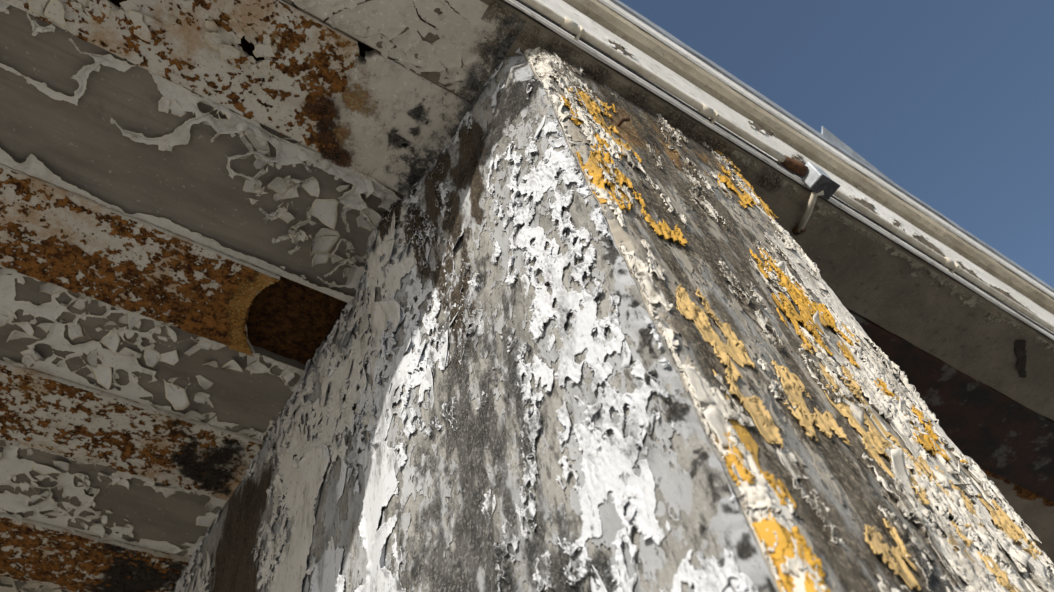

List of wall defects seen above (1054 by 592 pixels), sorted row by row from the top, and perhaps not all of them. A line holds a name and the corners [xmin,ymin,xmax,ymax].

corrosion [64,0,385,168]
corrosion [0,168,347,365]
peeling [0,0,521,592]
leakage [377,0,1022,592]
peeling [486,47,1054,592]
corrosion [0,518,189,592]
corrosion [0,365,262,497]
leakage [208,462,275,592]
corrosion [979,466,1054,507]